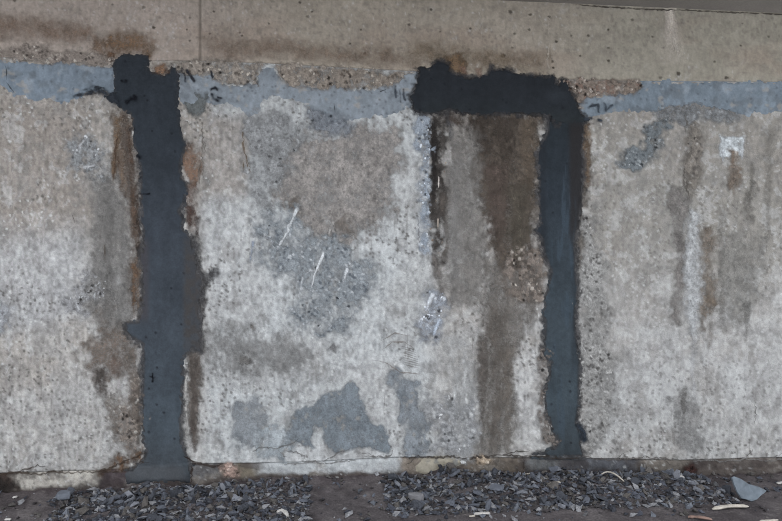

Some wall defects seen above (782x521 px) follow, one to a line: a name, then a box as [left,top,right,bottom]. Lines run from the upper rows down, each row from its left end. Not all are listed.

spalling [276,62,412,92]
spalling [559,76,642,108]
water stain [745,141,772,221]
water stain [85,178,133,333]
water stain [426,112,544,461]
water stain [667,175,703,338]
crack [254,438,674,473]